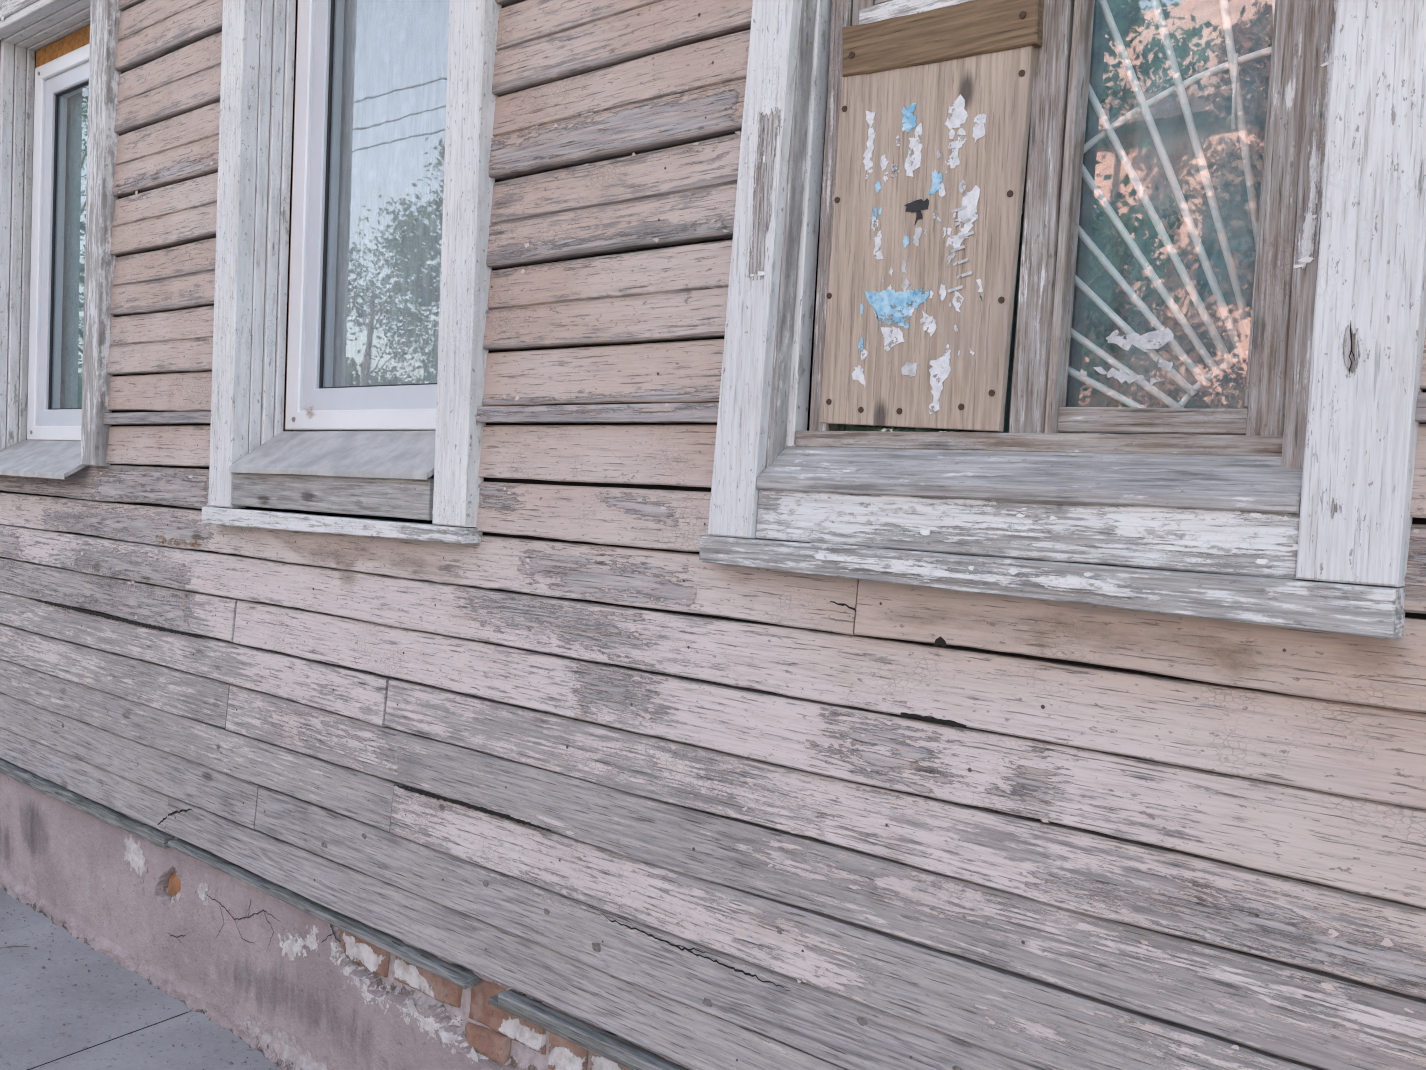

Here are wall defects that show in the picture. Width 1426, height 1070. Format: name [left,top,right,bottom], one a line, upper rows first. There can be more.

peeling [1293,0,1337,271]
peeling [758,489,1165,607]
peeling [1099,505,1300,576]
spalling [124,834,181,907]
crack [168,894,281,946]
flaking render [278,920,630,1070]
peeling [260,698,881,1001]
crack [602,914,791,991]
peeling [454,547,1426,1070]